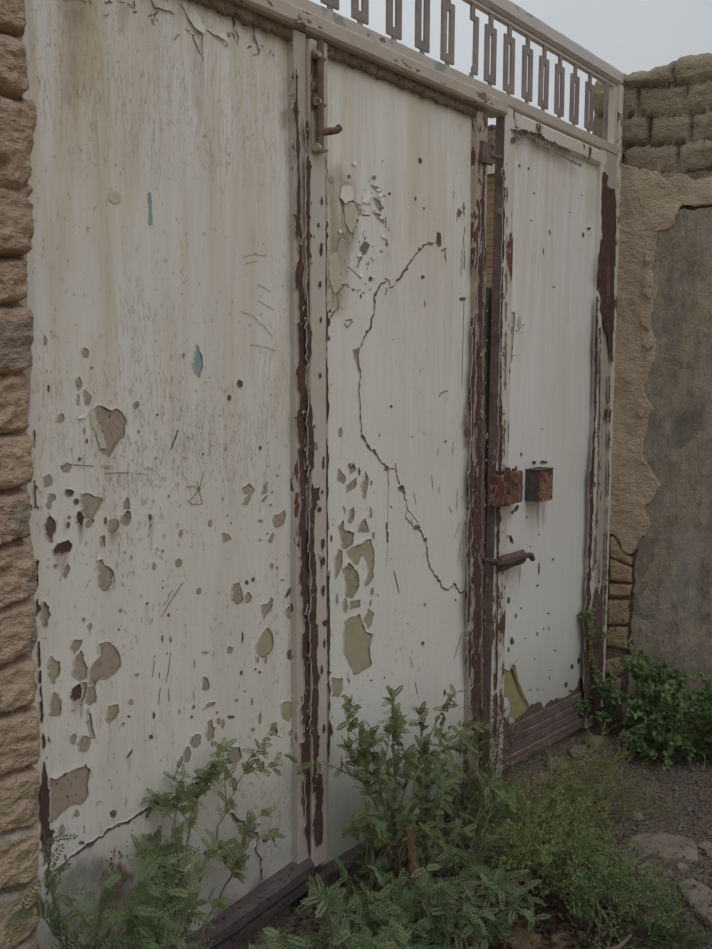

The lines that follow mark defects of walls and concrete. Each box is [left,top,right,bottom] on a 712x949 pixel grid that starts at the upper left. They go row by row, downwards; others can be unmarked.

peeling [328,161,391,328]
corrosion [29,479,39,511]
corrosion [35,558,46,620]
corrosion [36,635,57,896]
peeling [47,617,121,844]
peeling [43,375,140,591]
crack [52,794,177,881]
peeling [231,563,291,675]
corrosion [289,68,334,856]
peeling [330,462,379,719]
crack [352,231,465,594]
corrosion [463,163,617,756]